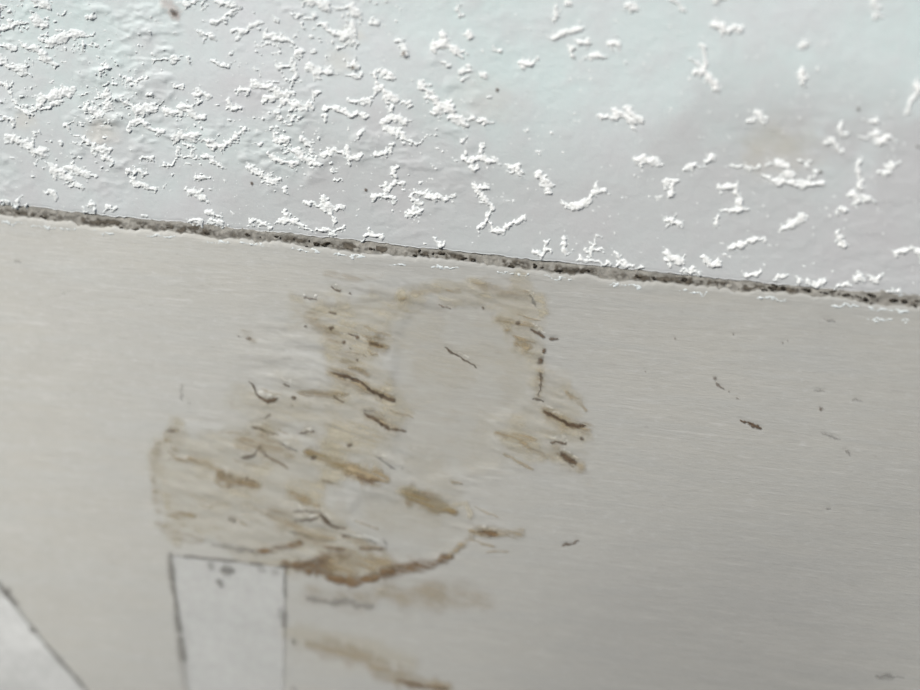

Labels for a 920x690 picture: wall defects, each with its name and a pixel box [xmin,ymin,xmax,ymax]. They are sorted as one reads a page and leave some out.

crack [445,347,476,368]
crack [240,377,292,459]
crack [333,373,407,432]
crack [534,371,586,467]
leakage [289,423,388,507]
crack [294,504,379,544]